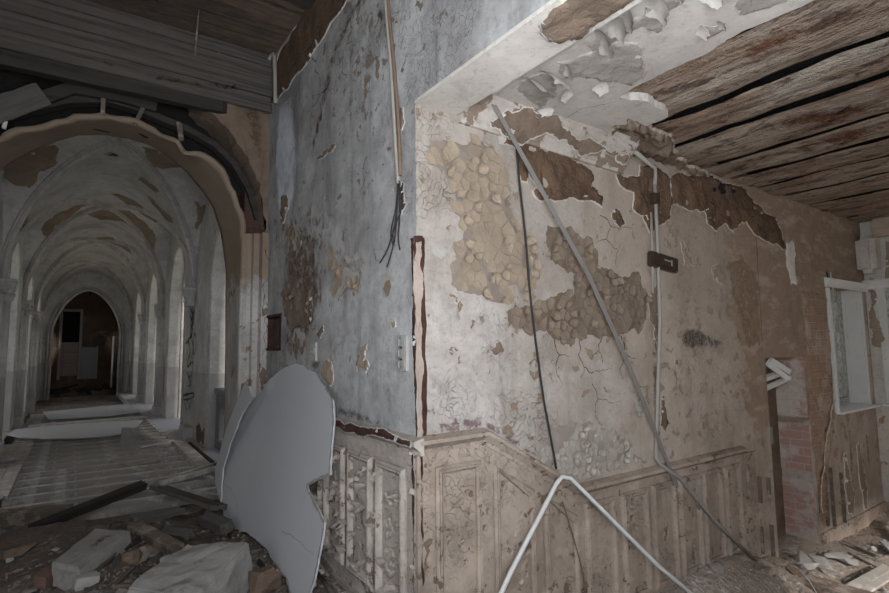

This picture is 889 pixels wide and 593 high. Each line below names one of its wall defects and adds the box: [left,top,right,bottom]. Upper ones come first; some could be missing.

flaking render [2,144,60,188]
flaking render [40,176,174,250]
peeling [281,276,324,360]
peeling [308,0,835,593]
crack [554,336,636,426]